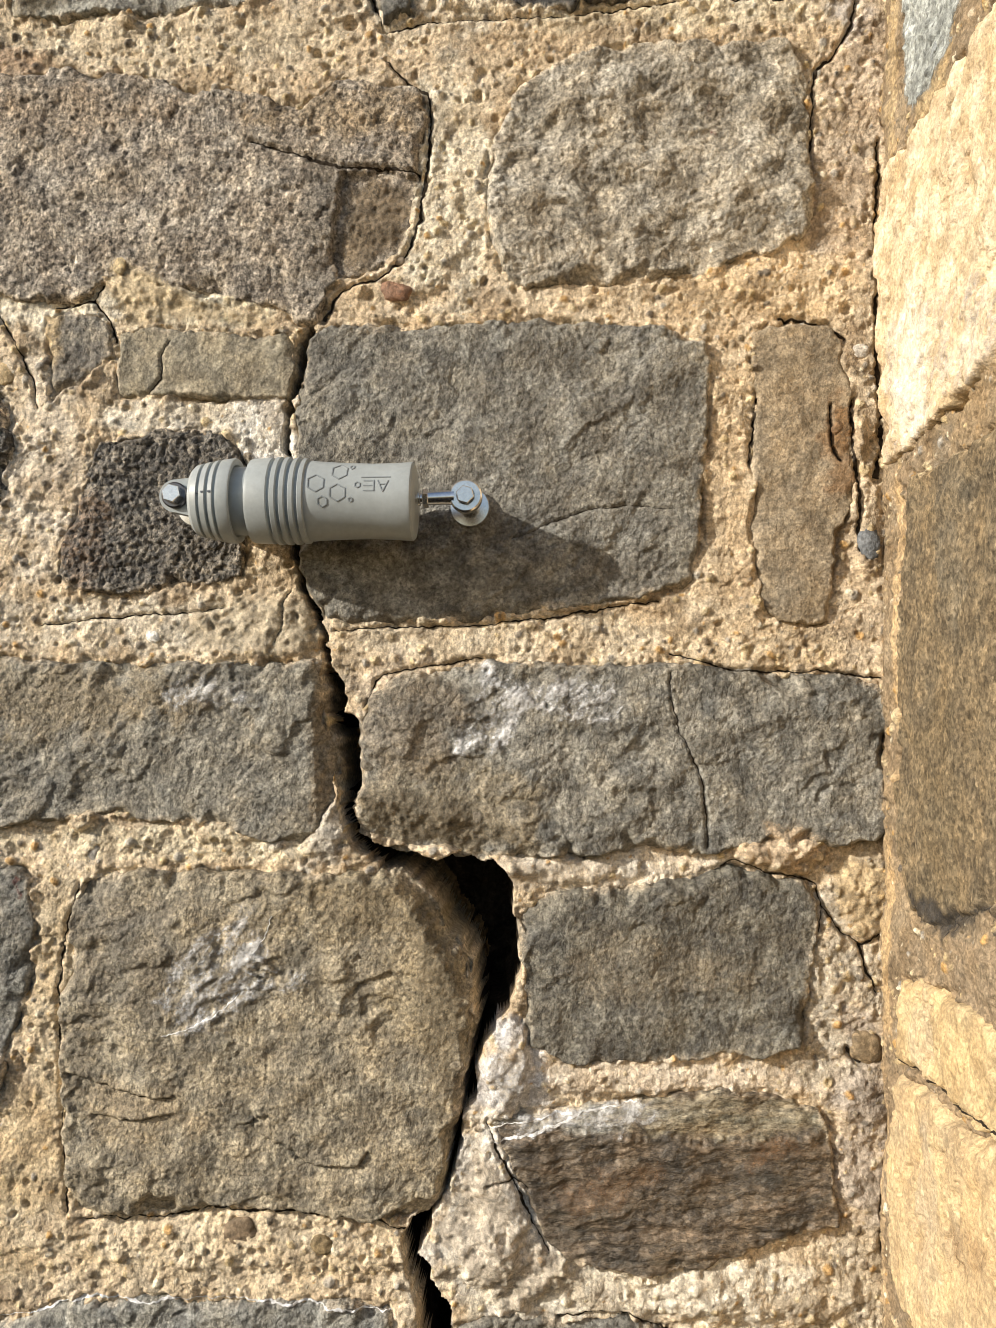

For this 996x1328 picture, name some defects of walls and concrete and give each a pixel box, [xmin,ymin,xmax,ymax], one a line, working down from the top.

crack [345,780,400,862]
crack [274,591,659,730]
crack [669,653,881,993]
crack [57,884,344,1220]
crack [443,854,549,1251]
crack [377,1206,452,1328]